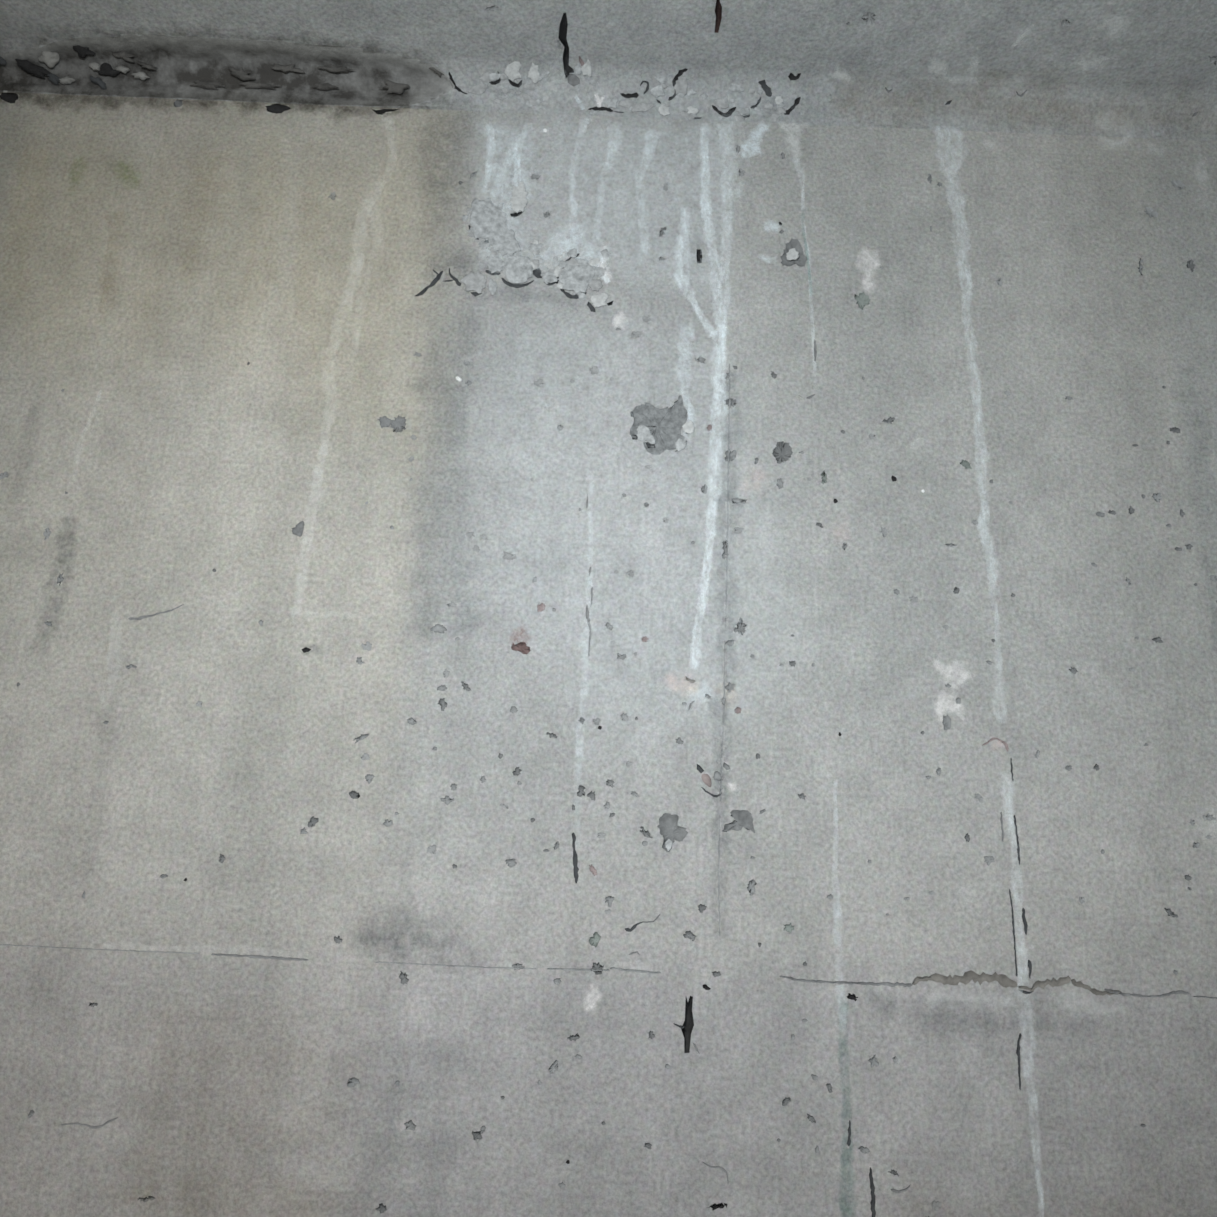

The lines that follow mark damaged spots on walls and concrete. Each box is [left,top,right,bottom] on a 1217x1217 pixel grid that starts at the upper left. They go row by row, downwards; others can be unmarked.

damp [415,181,622,324]
spalling [765,222,807,267]
spalling [630,395,712,469]
crack [780,812,1217,999]
crack [0,944,308,961]
crack [375,914,661,974]
crack [1015,1033,1023,1090]
crack [869,1167,911,1217]